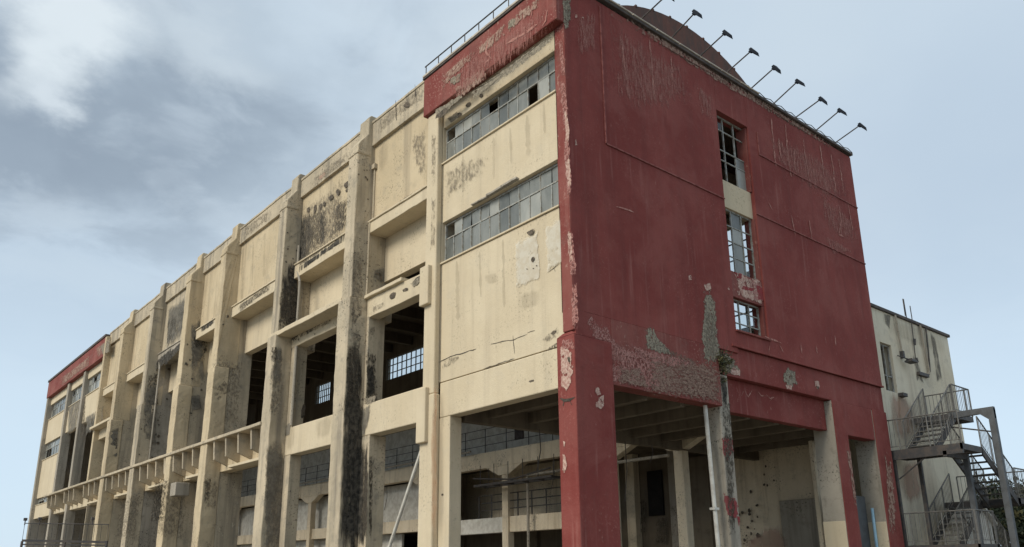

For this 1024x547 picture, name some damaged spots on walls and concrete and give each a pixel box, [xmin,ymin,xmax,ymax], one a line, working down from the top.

peeling [562,0,584,29]
peeling [435,0,577,194]
water stain [279,186,347,329]
water stain [340,258,377,547]
crack [440,330,535,369]
peeling [595,387,604,409]
peeling [545,232,740,403]
peeling [728,272,764,304]
spalling [783,368,797,390]
water stain [265,446,283,547]